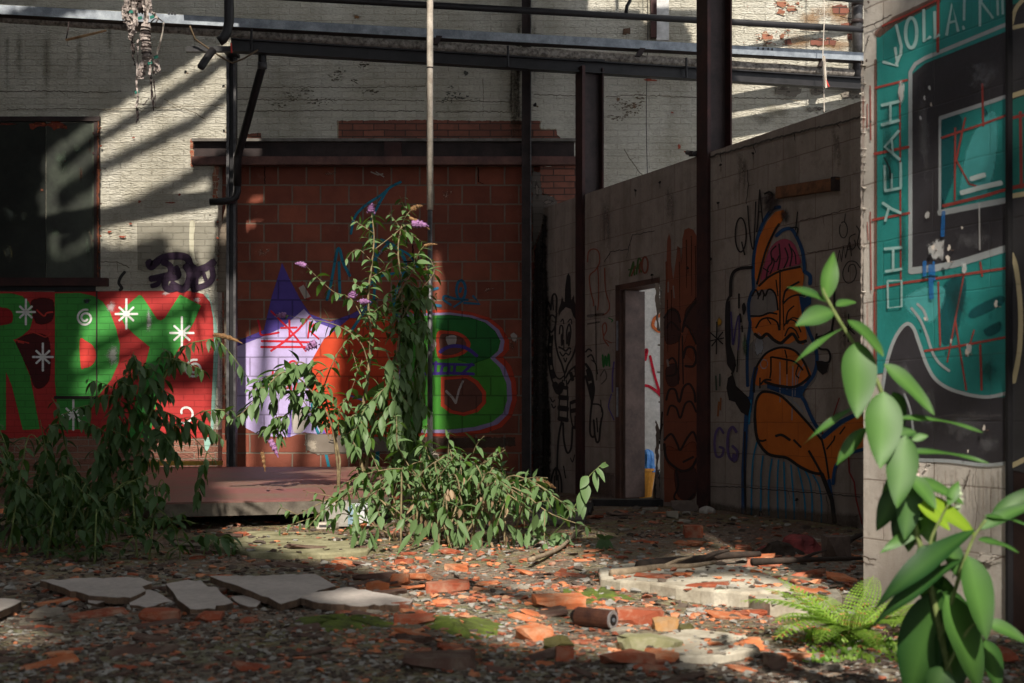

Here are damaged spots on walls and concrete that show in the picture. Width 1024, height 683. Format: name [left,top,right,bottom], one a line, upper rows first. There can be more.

peeling [743,0,852,47]